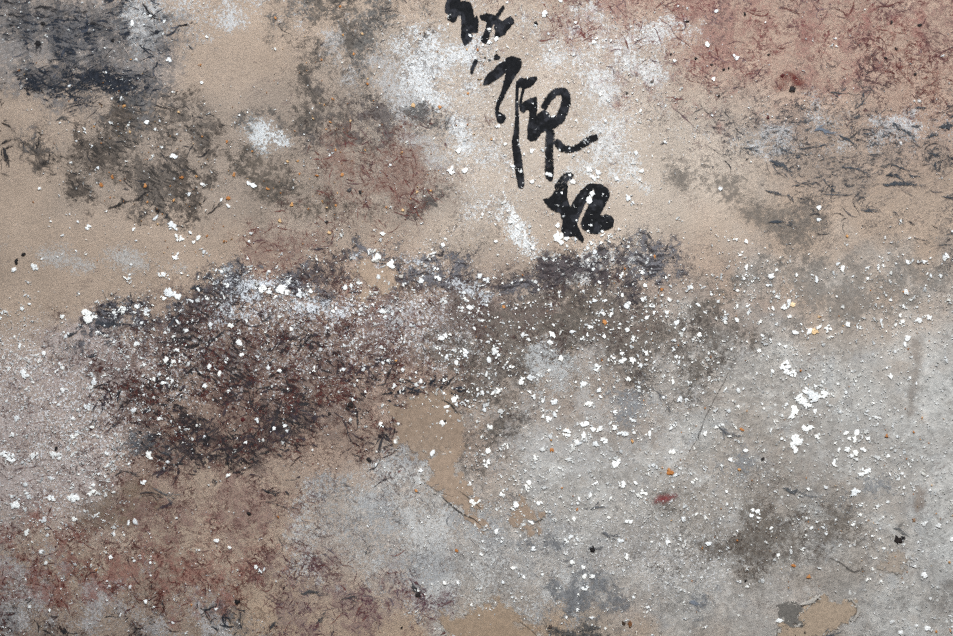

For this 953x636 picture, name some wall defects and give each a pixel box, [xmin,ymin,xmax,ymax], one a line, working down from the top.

water stain [14,0,270,231]
water stain [381,172,449,224]
water stain [25,242,188,275]
water stain [688,498,871,579]